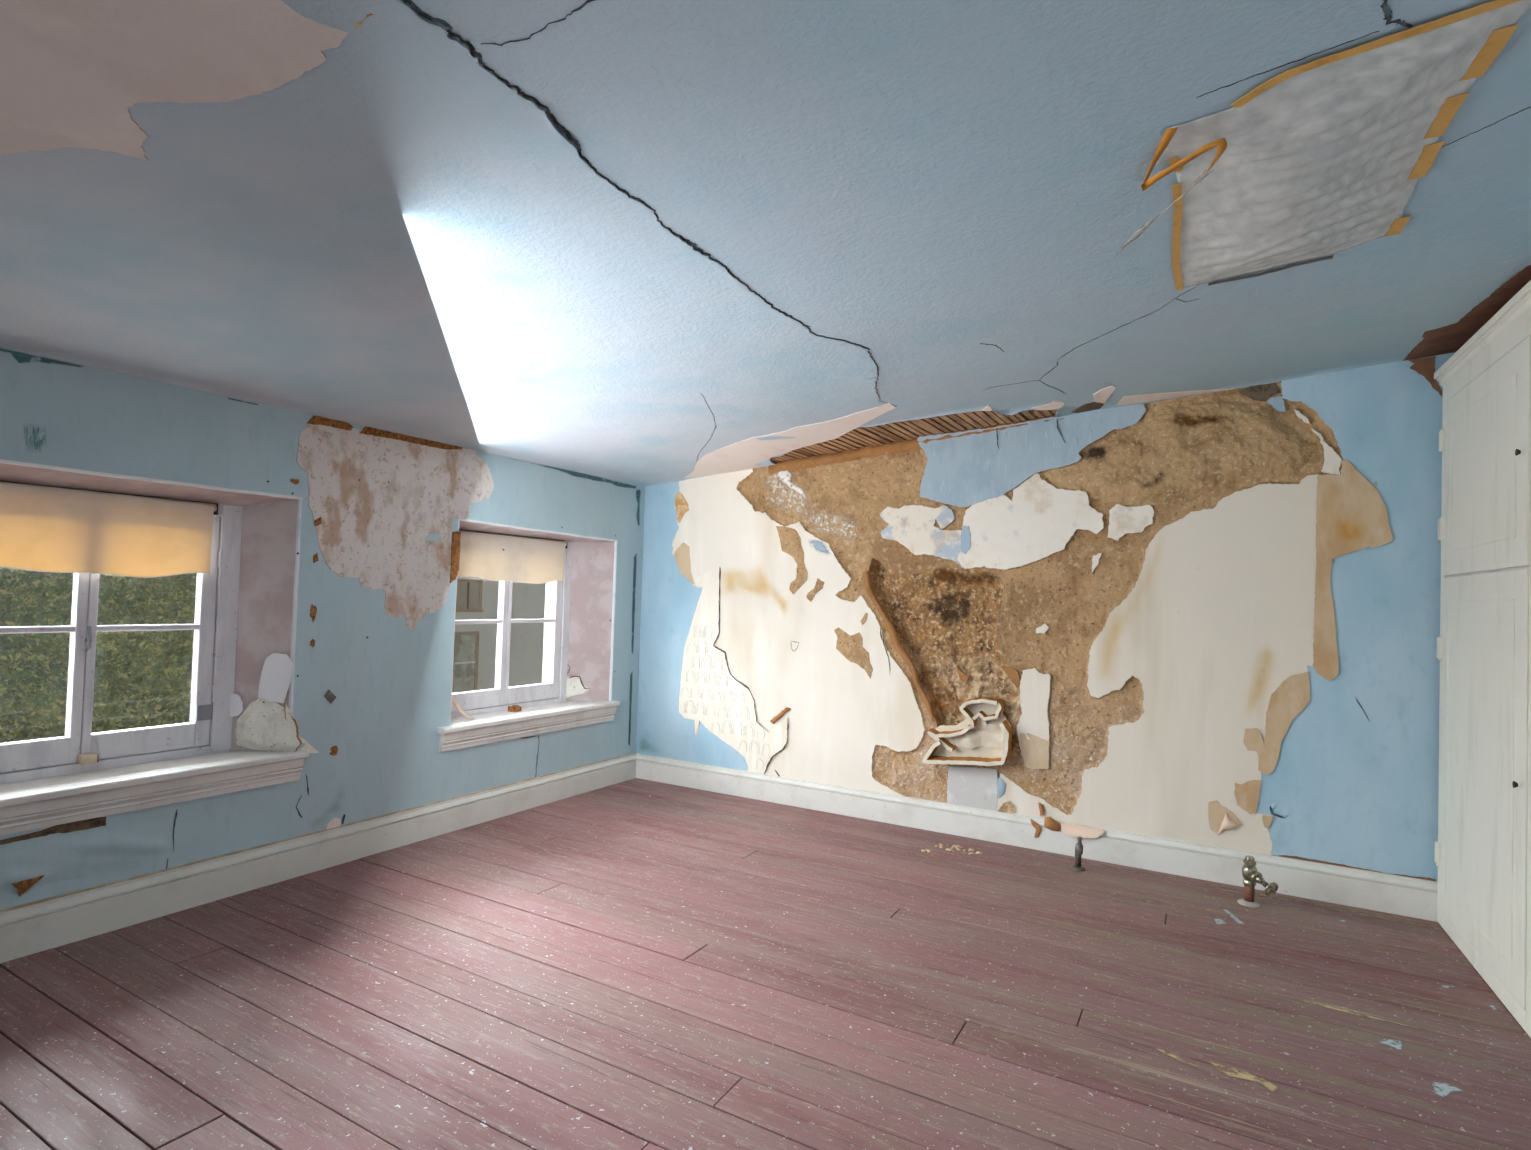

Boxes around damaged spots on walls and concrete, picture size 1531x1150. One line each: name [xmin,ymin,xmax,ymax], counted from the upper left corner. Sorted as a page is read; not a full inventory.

peeling [0,0,374,160]
crack [281,0,897,413]
crack [1380,0,1413,28]
crack [1442,106,1531,147]
peeling [290,416,494,631]
leakage [1085,447,1106,459]
spalling [684,381,1343,837]
crack [166,810,178,869]